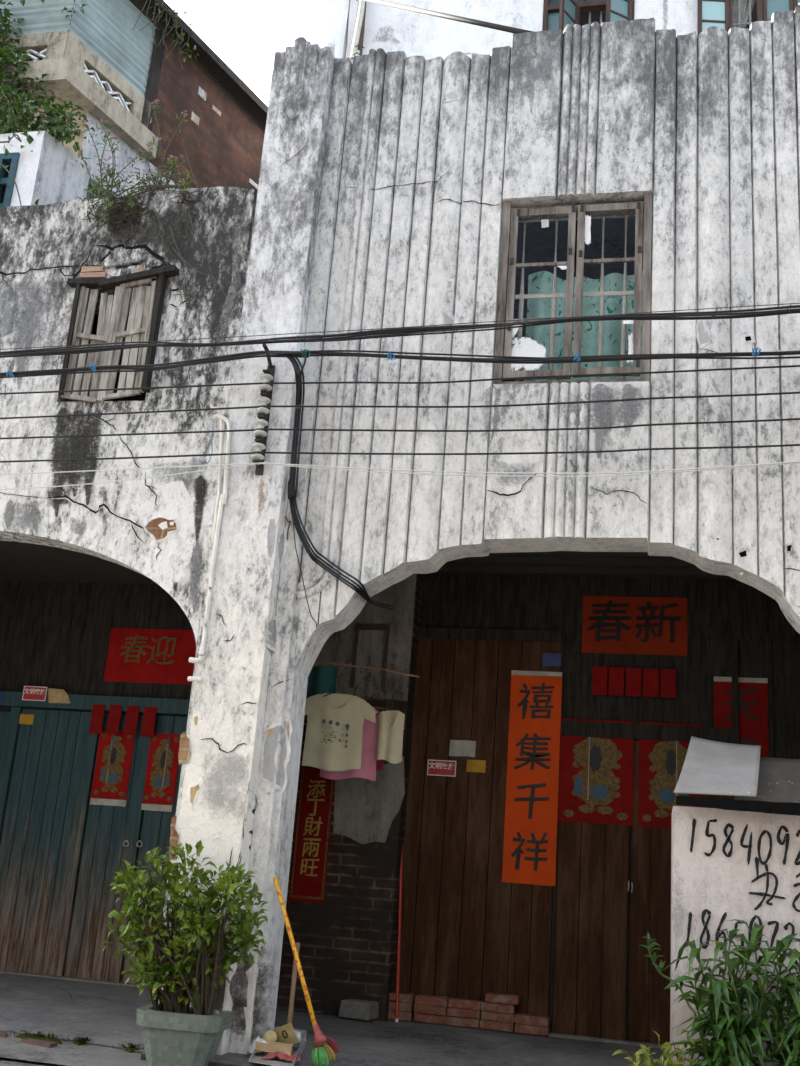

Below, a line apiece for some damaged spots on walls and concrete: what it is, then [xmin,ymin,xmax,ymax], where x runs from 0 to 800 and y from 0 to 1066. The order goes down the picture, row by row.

crack [342,172,499,206]
crack [0,244,188,307]
water stain [5,408,101,533]
crack [0,412,180,560]
spalling [143,514,181,544]
spalling [261,616,279,653]
spalling [178,716,198,765]
crack [200,738,247,754]
spalling [259,716,292,795]
peeling [187,756,245,814]
spalling [168,816,179,861]